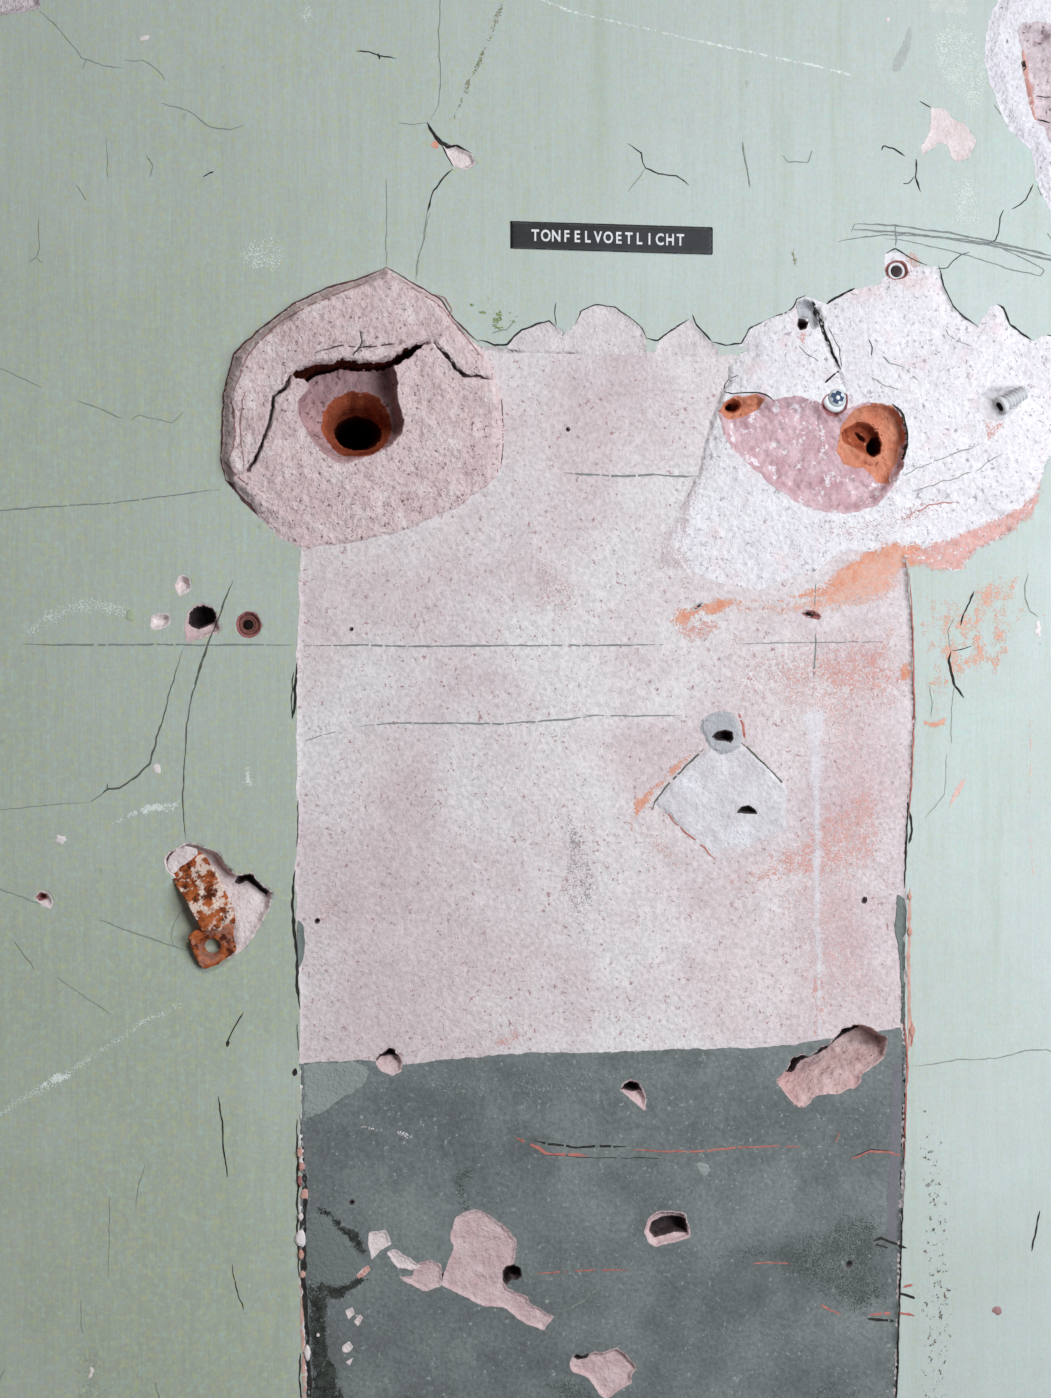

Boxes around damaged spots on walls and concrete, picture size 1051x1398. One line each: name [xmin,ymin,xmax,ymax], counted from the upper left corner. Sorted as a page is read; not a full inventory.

spalling [0,0,41,16]
crack [40,11,243,130]
peeling [921,108,976,162]
spalling [984,0,1051,210]
crack [220,0,1002,519]
crack [887,185,1051,347]
crack [79,401,181,423]
crack [0,582,233,836]
crack [925,499,1032,818]
spalling [164,842,273,959]
flaking render [291,252,1051,1398]
crack [920,1049,1051,1066]